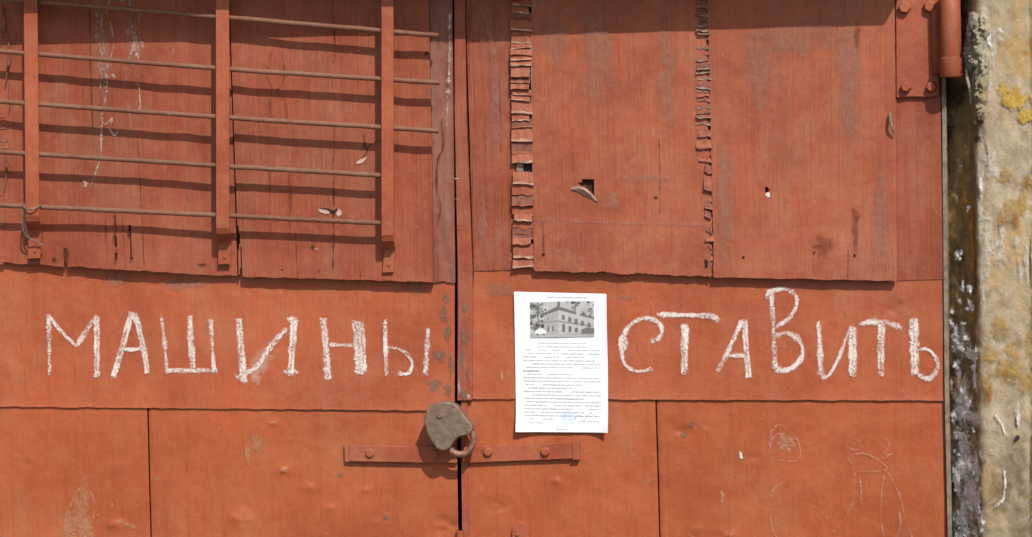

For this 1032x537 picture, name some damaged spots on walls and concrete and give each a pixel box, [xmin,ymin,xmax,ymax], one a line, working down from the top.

damp [946,79,968,162]
damp [960,0,968,46]
efflorescence [985,32,996,98]
crack [105,142,144,263]
efflorescence [976,151,1029,304]
peeling [949,278,986,537]